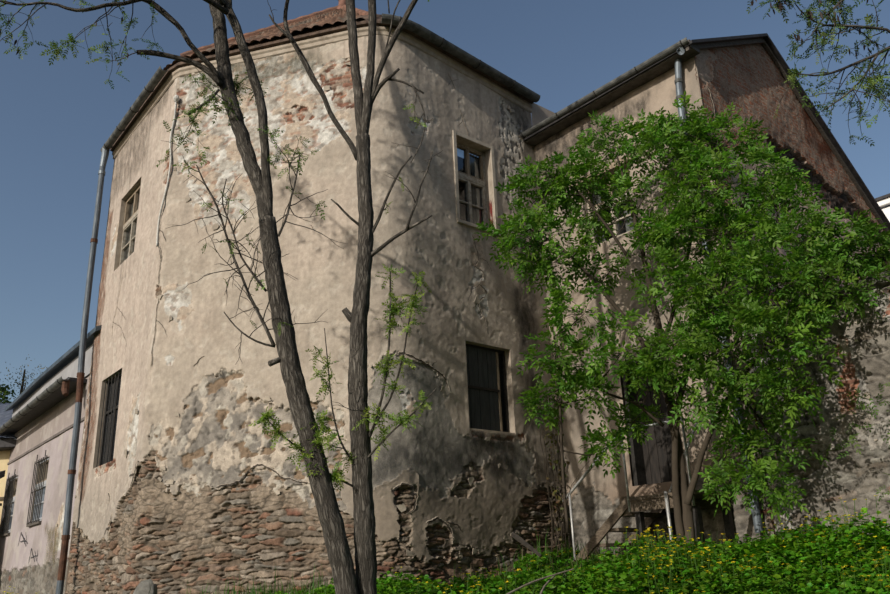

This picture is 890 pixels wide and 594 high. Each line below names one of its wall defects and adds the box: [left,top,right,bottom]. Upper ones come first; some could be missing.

flaking render [163,69,255,235]
flaking render [231,52,367,169]
flaking render [498,96,524,206]
flaking render [835,297,890,417]
flaking render [0,358,334,594]
flaking render [310,400,356,572]
flaking render [367,351,674,586]
flaking render [695,456,774,544]
flaking render [782,433,890,536]